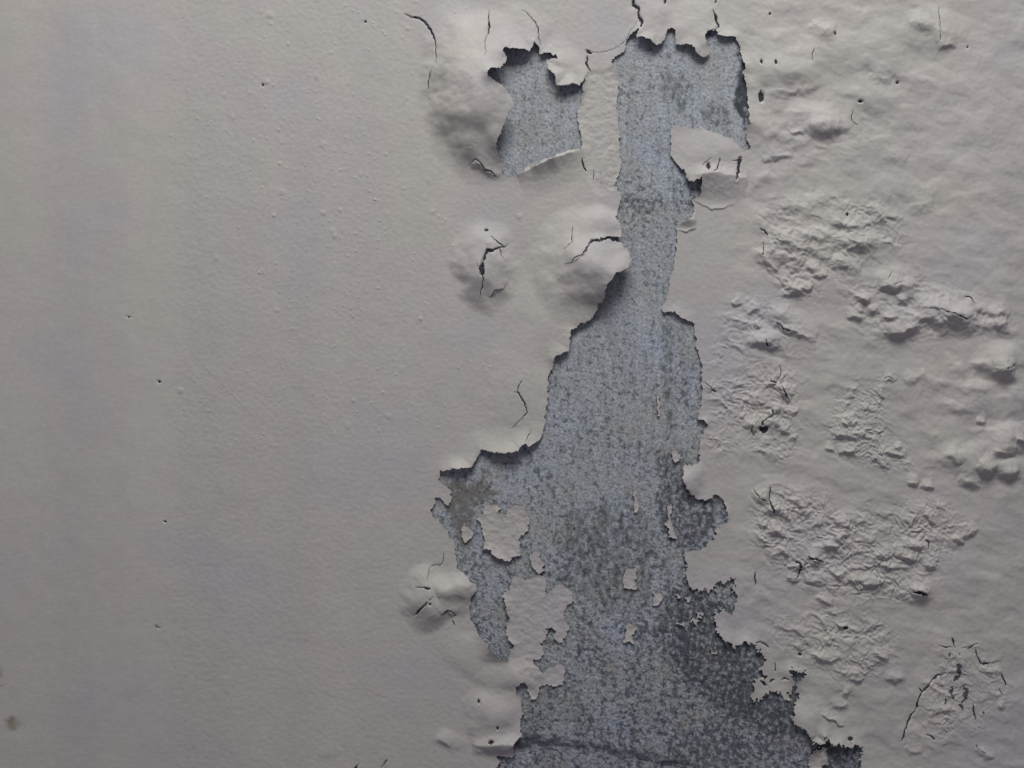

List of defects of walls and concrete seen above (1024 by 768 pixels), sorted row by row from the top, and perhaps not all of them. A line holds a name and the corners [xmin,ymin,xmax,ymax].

crack [406,14,437,88]
crack [476,236,507,298]
crack [564,228,603,264]
peeling [430,0,864,768]
crack [415,554,456,625]
crack [942,639,1006,695]
crack [902,673,945,740]